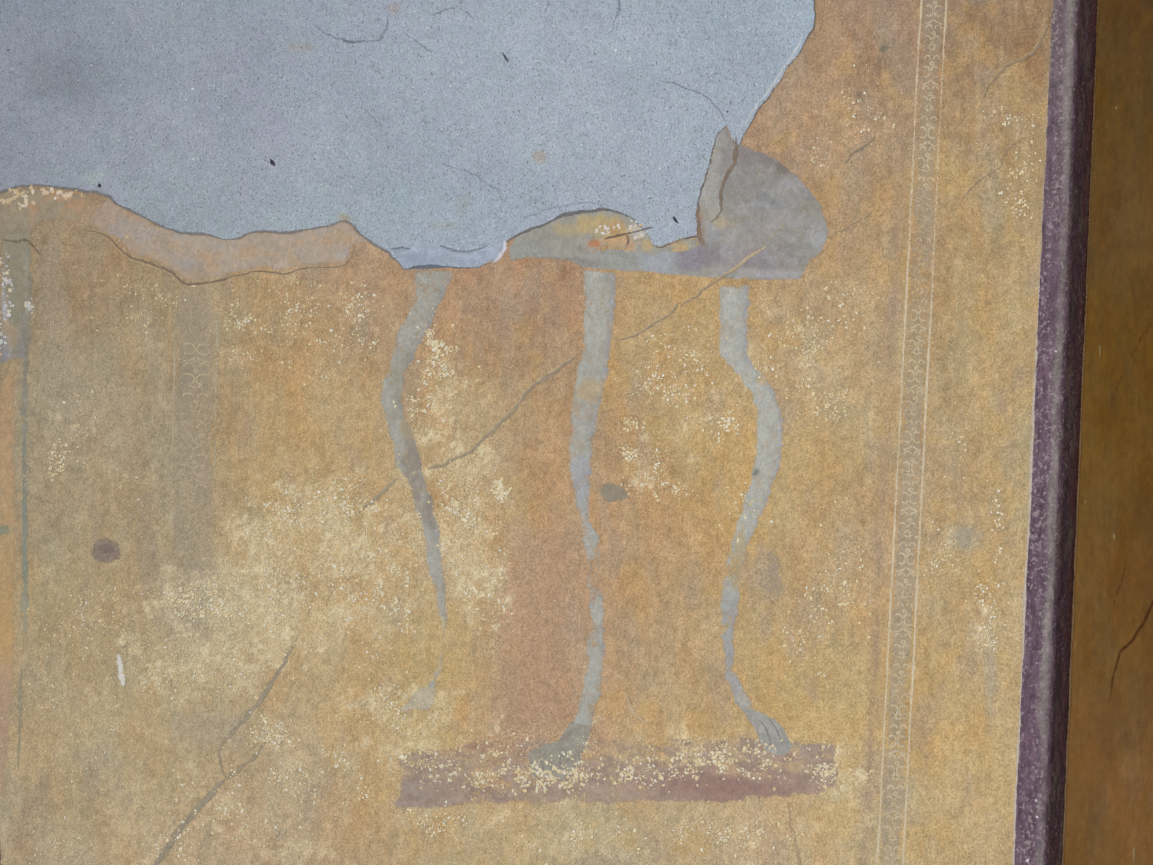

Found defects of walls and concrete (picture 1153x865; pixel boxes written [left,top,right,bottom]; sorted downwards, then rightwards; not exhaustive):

crack [312,16,432,53]
crack [619,223,785,340]
crack [428,356,576,470]
crack [154,478,397,865]
crack [1108,601,1153,703]